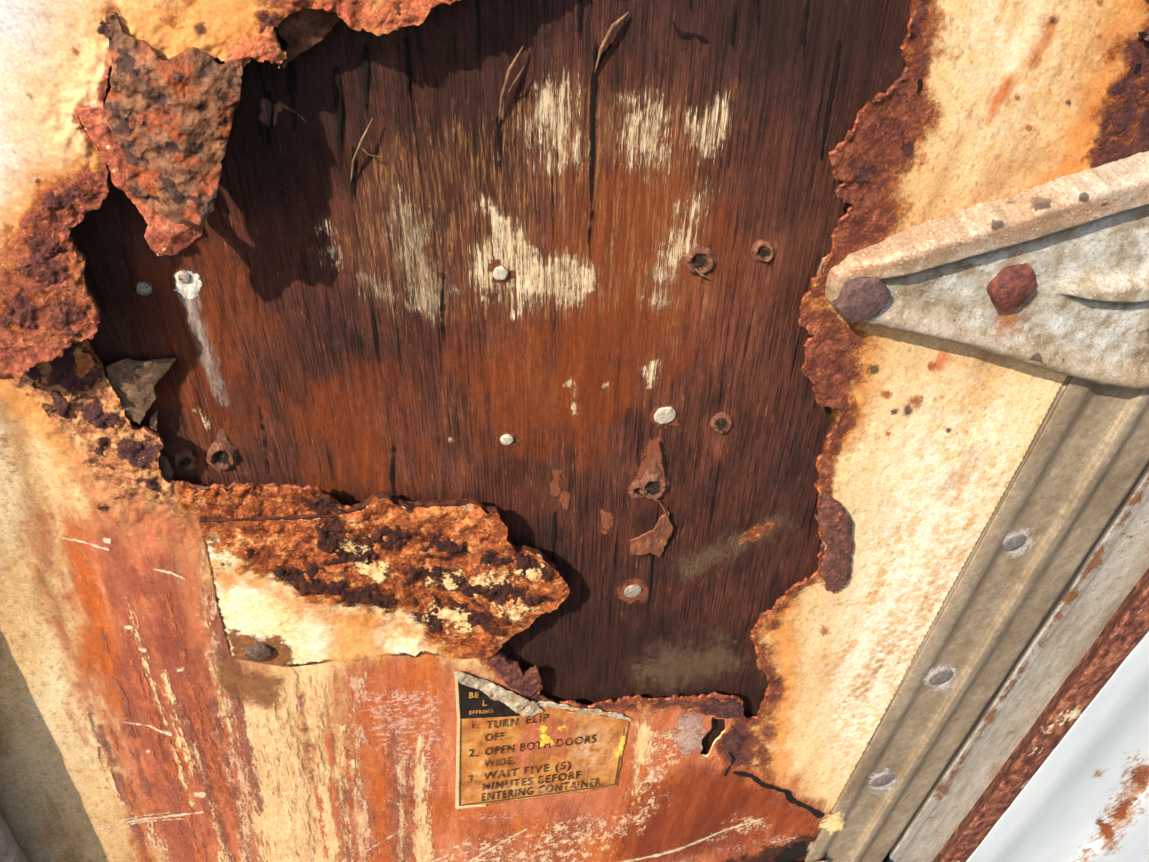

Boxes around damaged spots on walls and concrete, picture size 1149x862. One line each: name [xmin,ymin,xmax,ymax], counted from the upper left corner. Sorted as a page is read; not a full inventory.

peeling [77,12,243,256]
rust [100,0,456,68]
rust [1061,0,1149,176]
spalling [214,451,230,466]
rust [0,149,821,862]
spalling [635,482,660,496]
peeling [739,523,775,544]
rust [751,0,946,782]
peeling [196,589,693,862]
crack [724,751,824,818]
rust [933,663,1028,799]
rust [1077,757,1149,862]